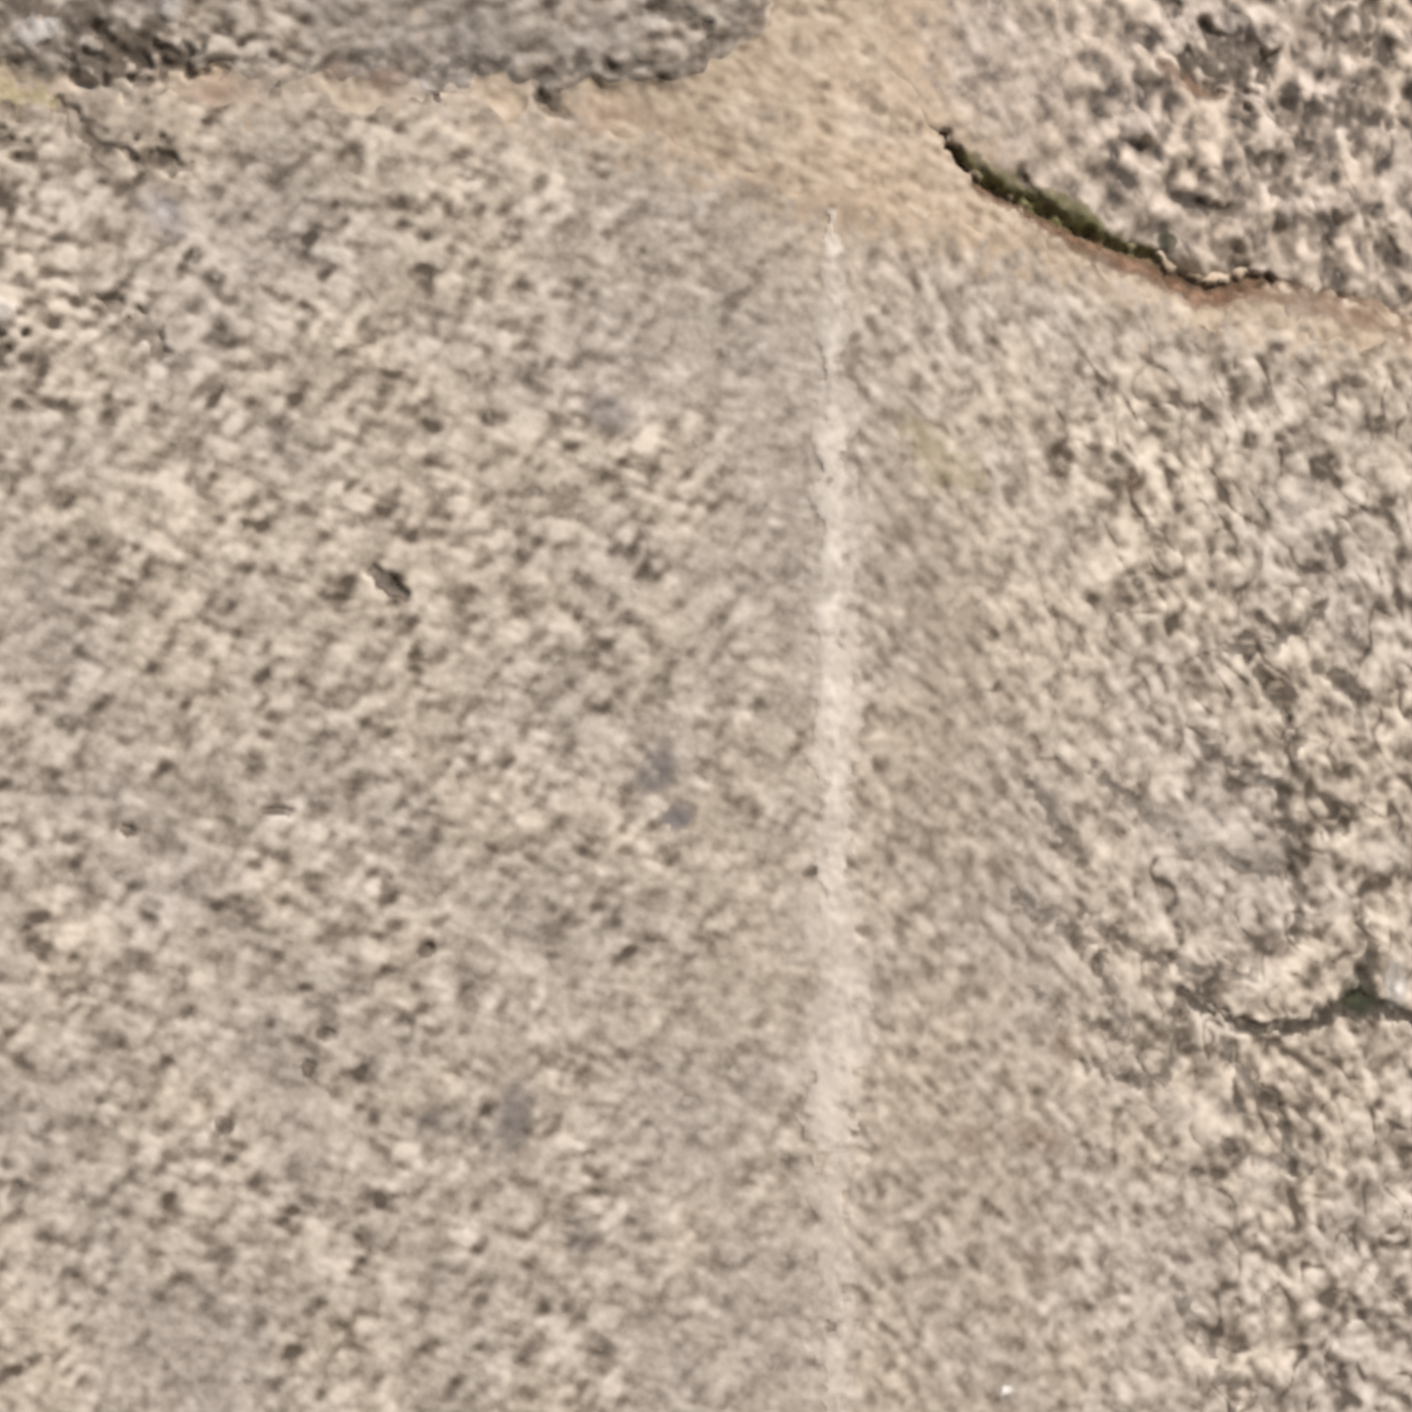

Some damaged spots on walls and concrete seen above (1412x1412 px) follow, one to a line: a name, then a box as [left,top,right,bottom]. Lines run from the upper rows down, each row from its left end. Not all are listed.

crack [939,132,1298,299]
crack [1125,917,1412,1172]